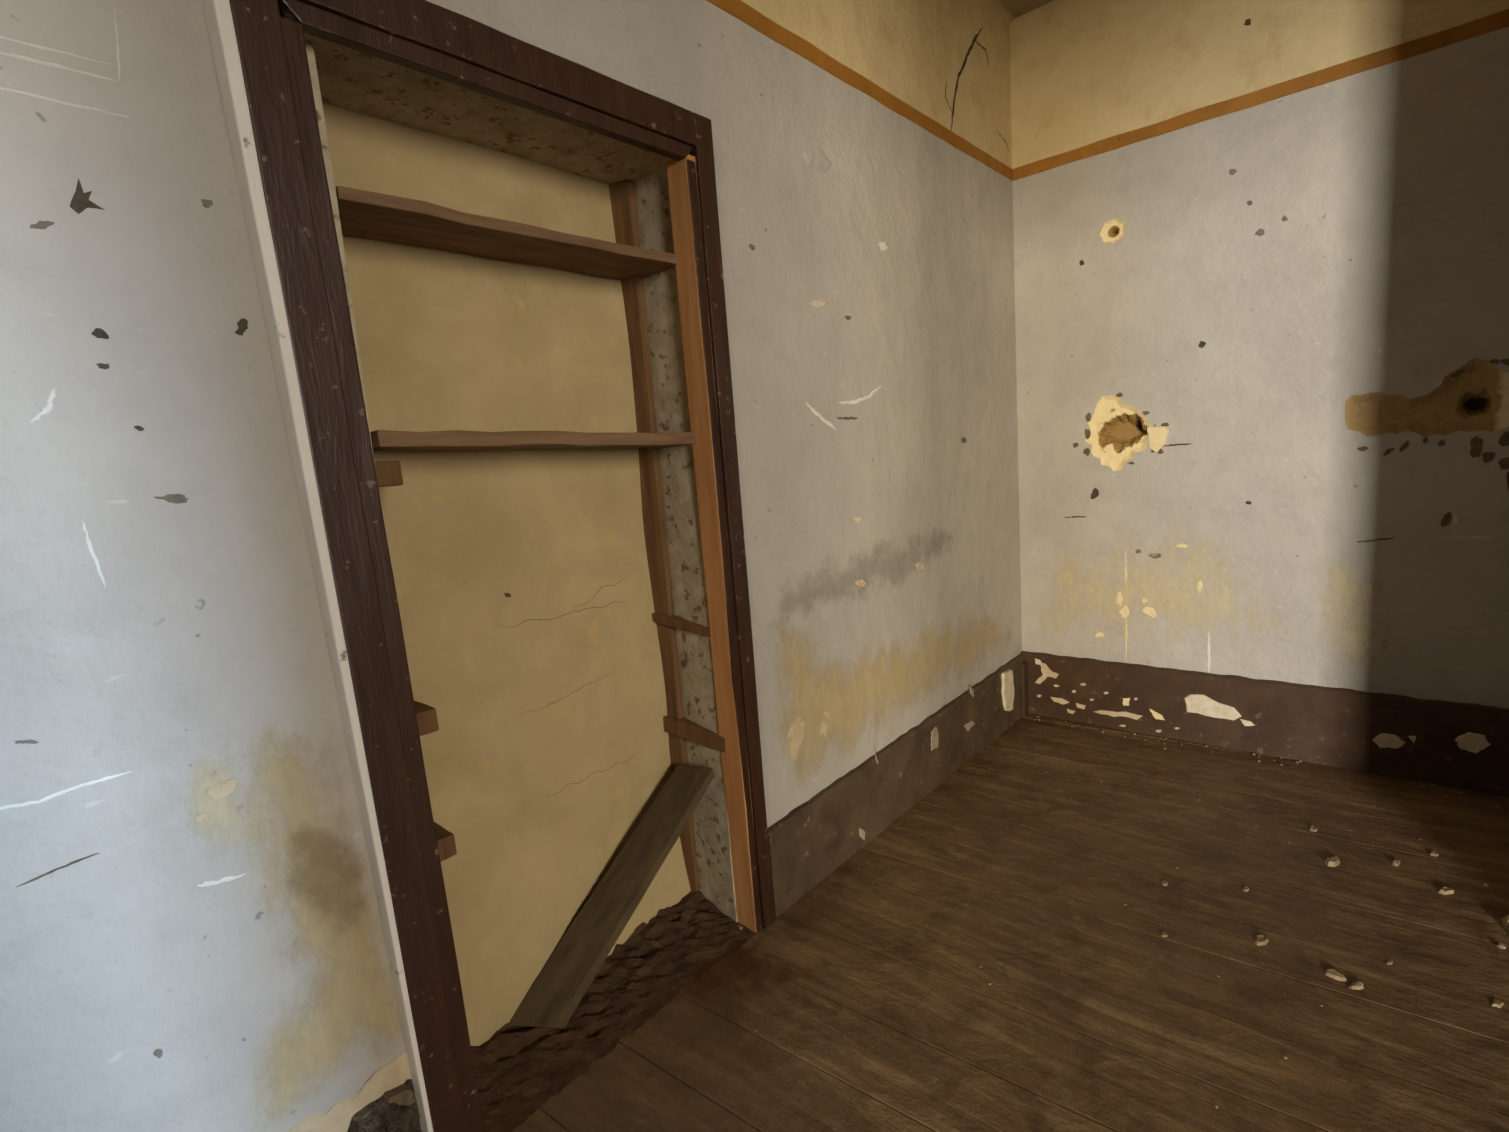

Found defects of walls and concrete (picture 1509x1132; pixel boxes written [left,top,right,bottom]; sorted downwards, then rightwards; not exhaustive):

spalling [1100,218,1126,243]
spalling [1073,393,1190,472]
spalling [1345,357,1509,491]
leakage [1066,543,1229,673]
leakage [786,625,997,764]
peeling [1035,658,1255,732]
peeling [1372,733,1416,749]
peeling [1455,732,1491,753]
leakage [197,873,246,887]
leakage [270,756,396,1094]
flaking render [286,1050,422,1132]